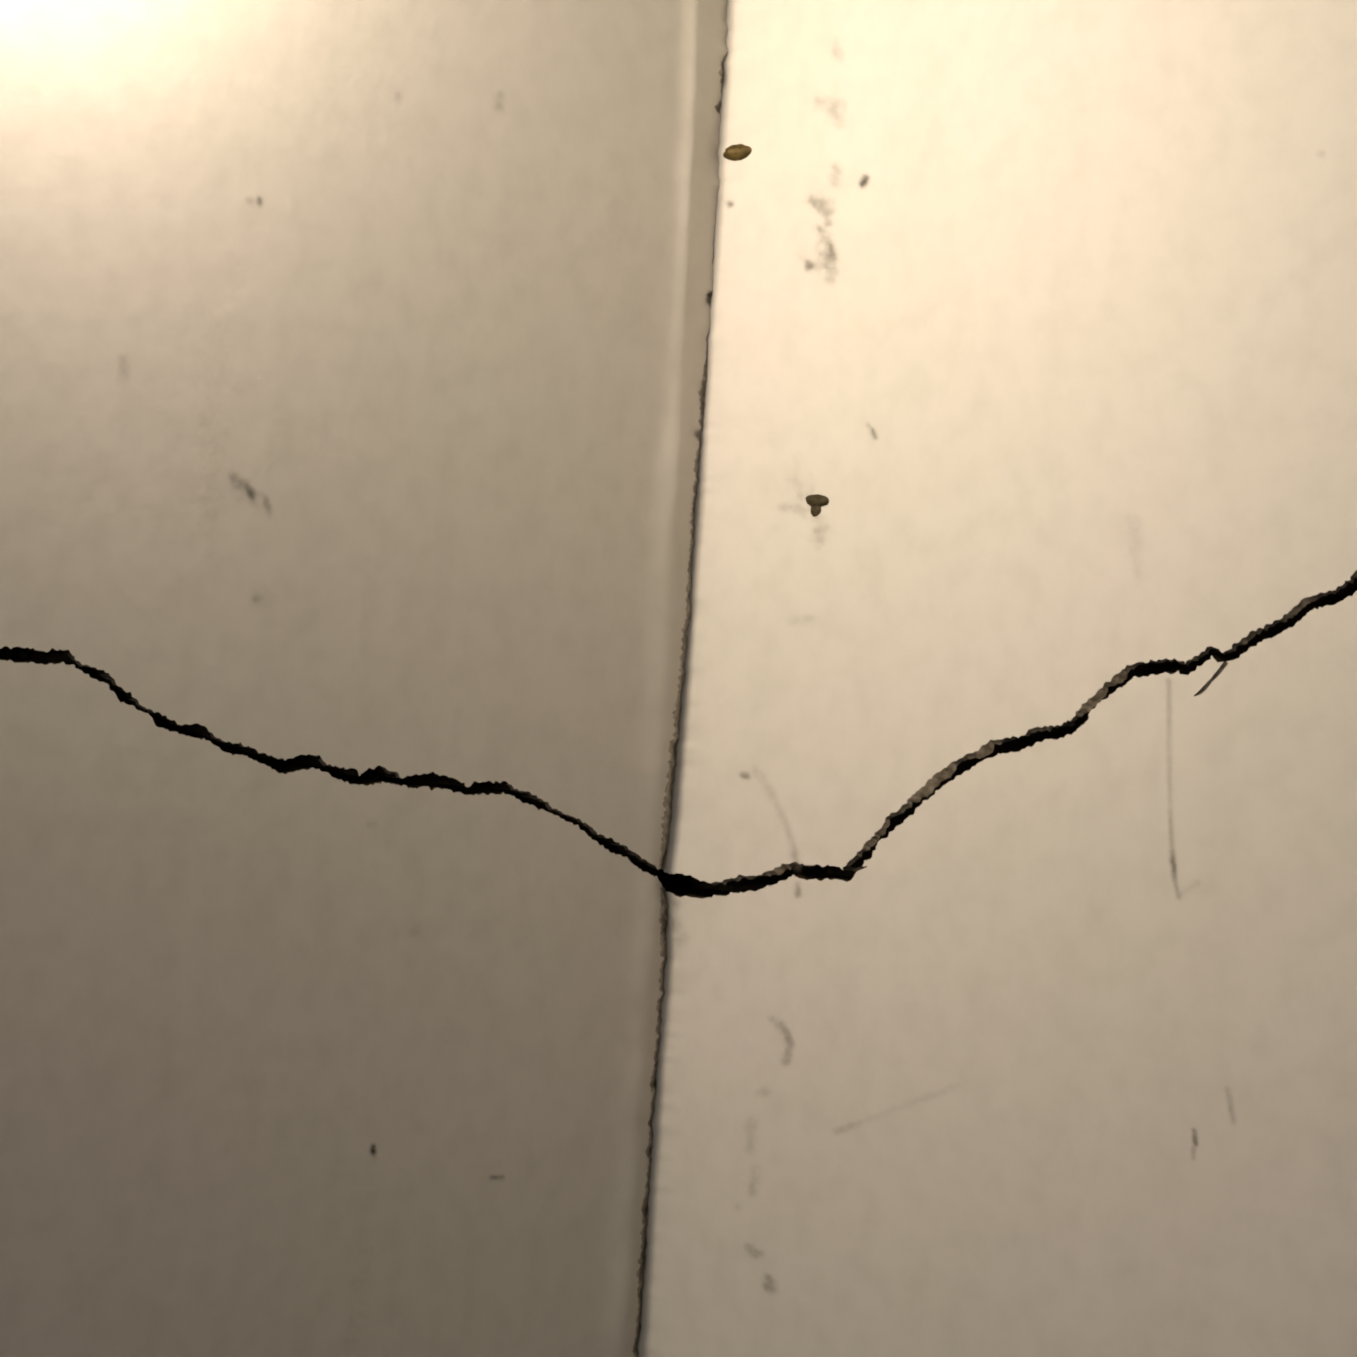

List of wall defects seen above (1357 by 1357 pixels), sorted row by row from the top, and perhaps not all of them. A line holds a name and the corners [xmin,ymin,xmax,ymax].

crack [715,52,728,113]
crack [0,291,1357,1357]